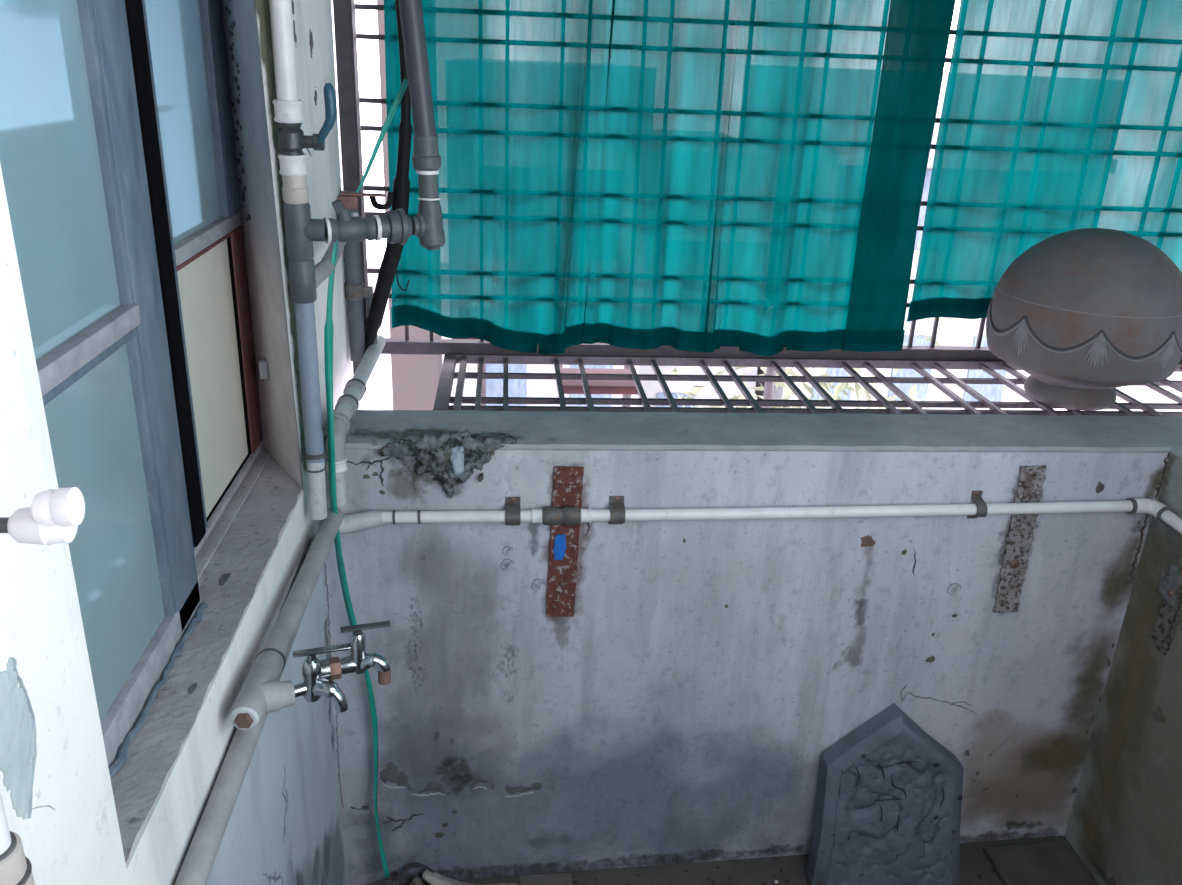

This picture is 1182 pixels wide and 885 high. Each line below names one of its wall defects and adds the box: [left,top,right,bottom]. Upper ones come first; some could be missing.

spalling [380,429,516,498]
damp [1146,460,1172,498]
peeling [0,657,37,820]
damp [963,534,1182,884]
peeling [379,762,446,796]
peeling [469,775,541,798]